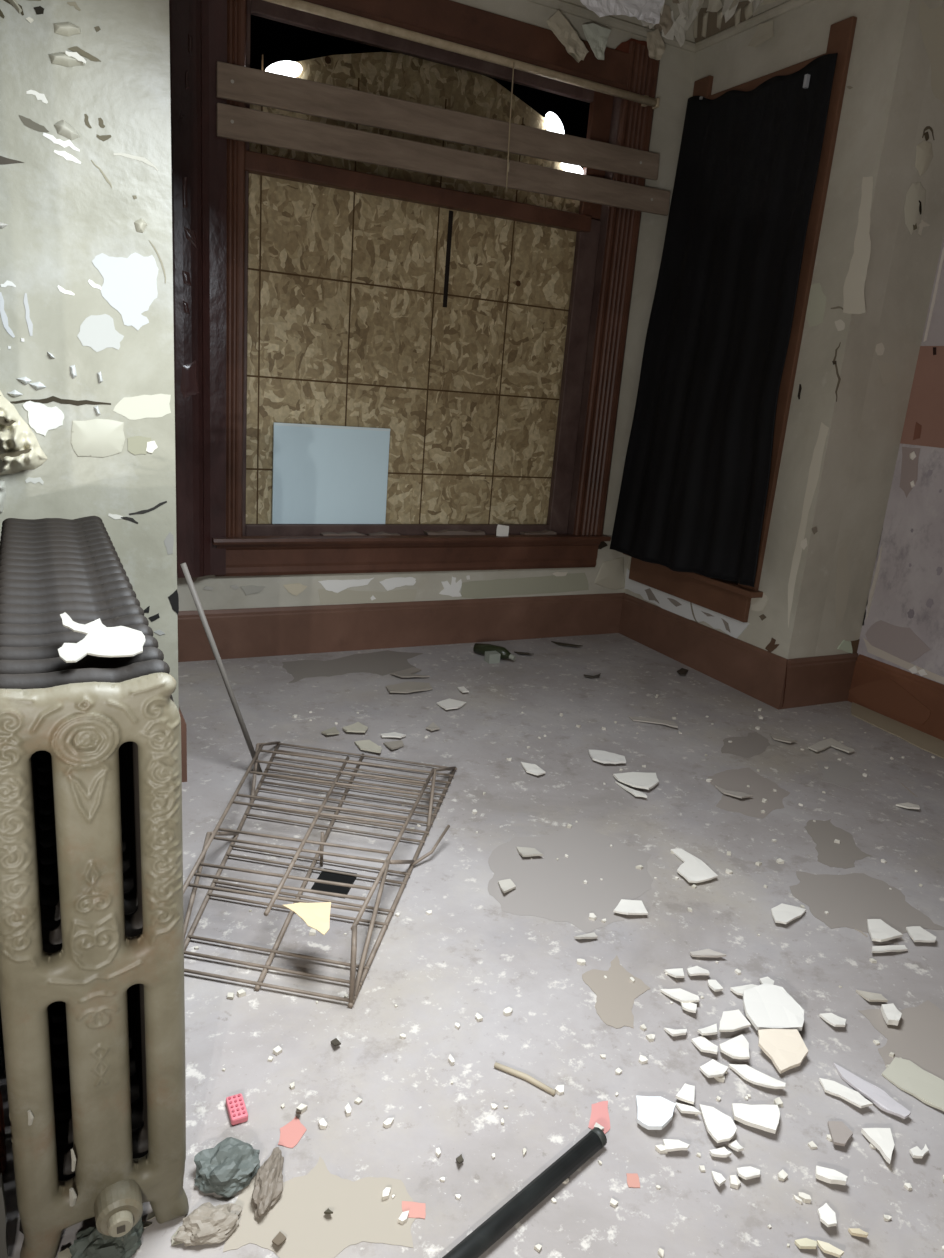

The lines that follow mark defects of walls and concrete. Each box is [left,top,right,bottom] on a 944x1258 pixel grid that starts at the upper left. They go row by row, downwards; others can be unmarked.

peeling [547,0,753,63]
peeling [0,156,24,164]
peeling [835,176,873,331]
crack [833,342,841,402]
crack [10,396,111,406]
peeling [113,394,171,420]
peeling [0,391,48,513]
peeling [127,436,158,455]
flaking render [318,577,417,604]
peeling [439,575,470,597]